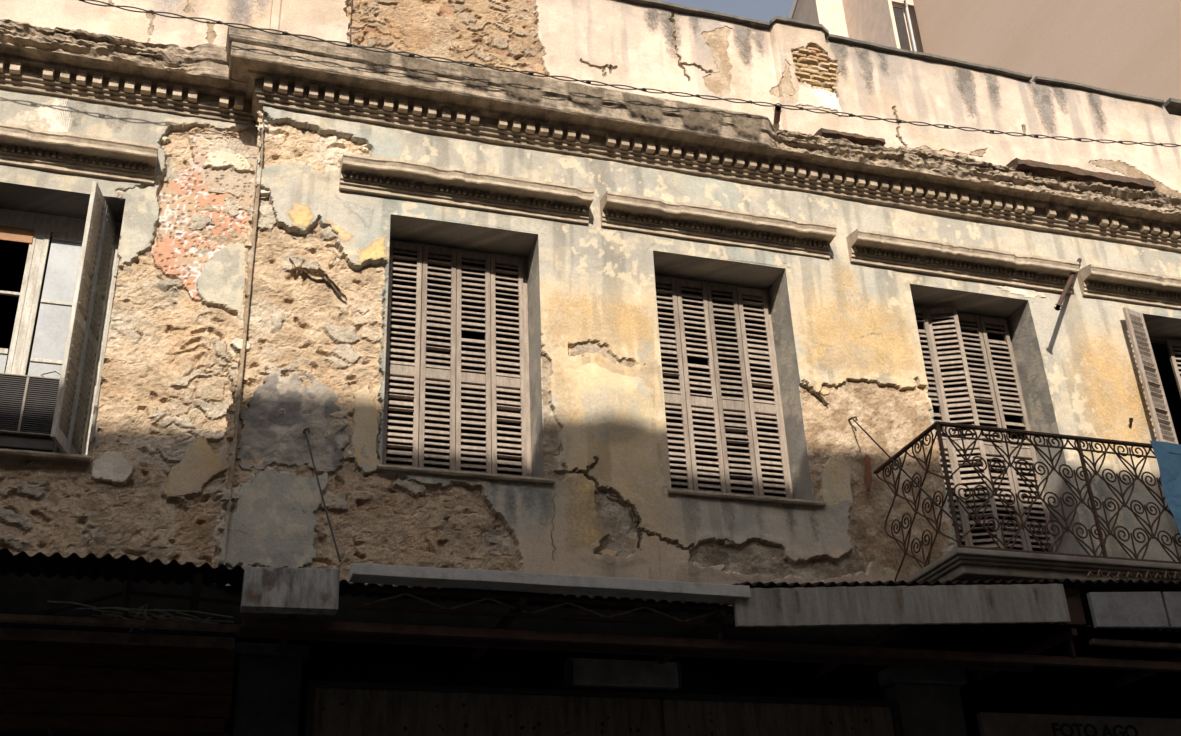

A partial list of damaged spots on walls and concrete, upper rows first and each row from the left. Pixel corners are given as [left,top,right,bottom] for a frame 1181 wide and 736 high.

flaking render [346,0,547,78]
crack [669,14,712,81]
flaking render [769,46,838,98]
flaking render [0,111,519,585]
crack [551,460,689,561]
flaking render [689,380,952,582]